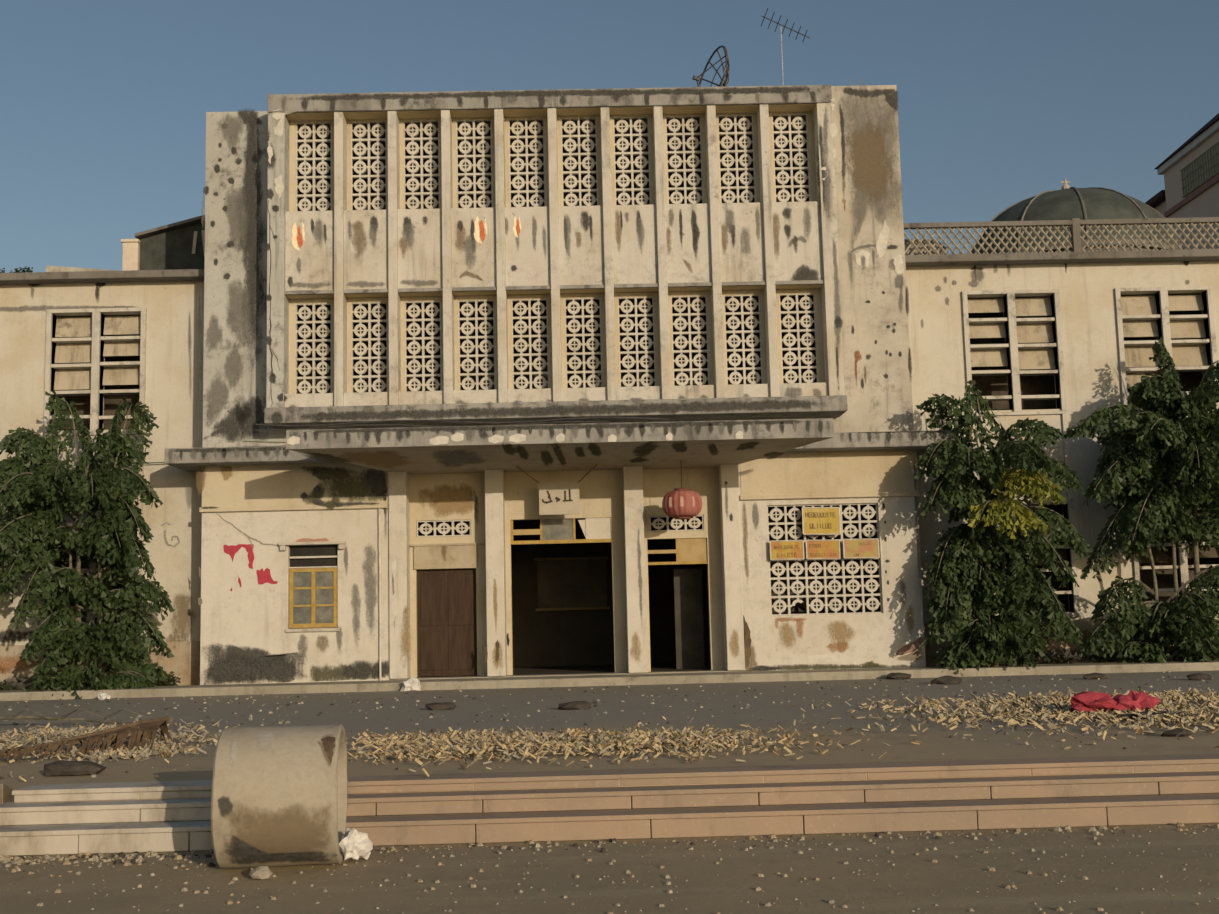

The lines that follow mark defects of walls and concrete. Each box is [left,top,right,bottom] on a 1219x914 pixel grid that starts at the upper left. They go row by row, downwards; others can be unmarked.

leakage [168,87,953,520]
peeling [223,544,278,591]
leakage [204,547,389,685]